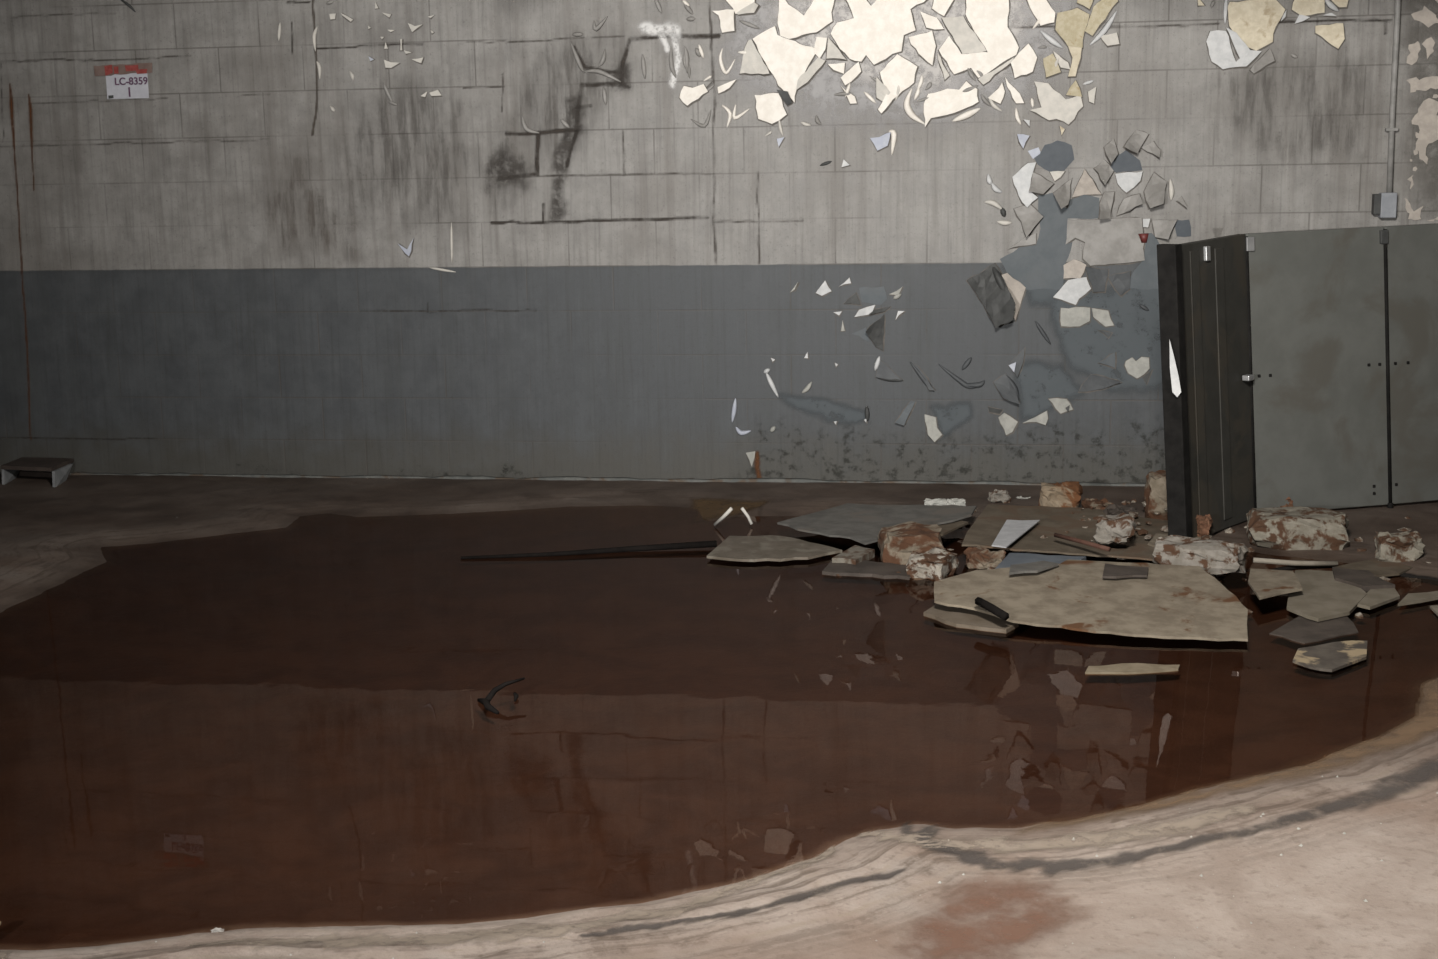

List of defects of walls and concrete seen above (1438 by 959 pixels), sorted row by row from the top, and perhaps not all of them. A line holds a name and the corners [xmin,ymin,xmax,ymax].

corrosion [9,84,34,428]
damp [489,154,523,182]
damp [552,100,581,218]
peeling [570,16,621,105]
damp [613,66,628,87]
crack [491,11,760,263]
peeling [669,0,1191,443]
peeling [1197,0,1350,75]
peeling [1405,0,1438,221]
peeling [746,450,761,478]